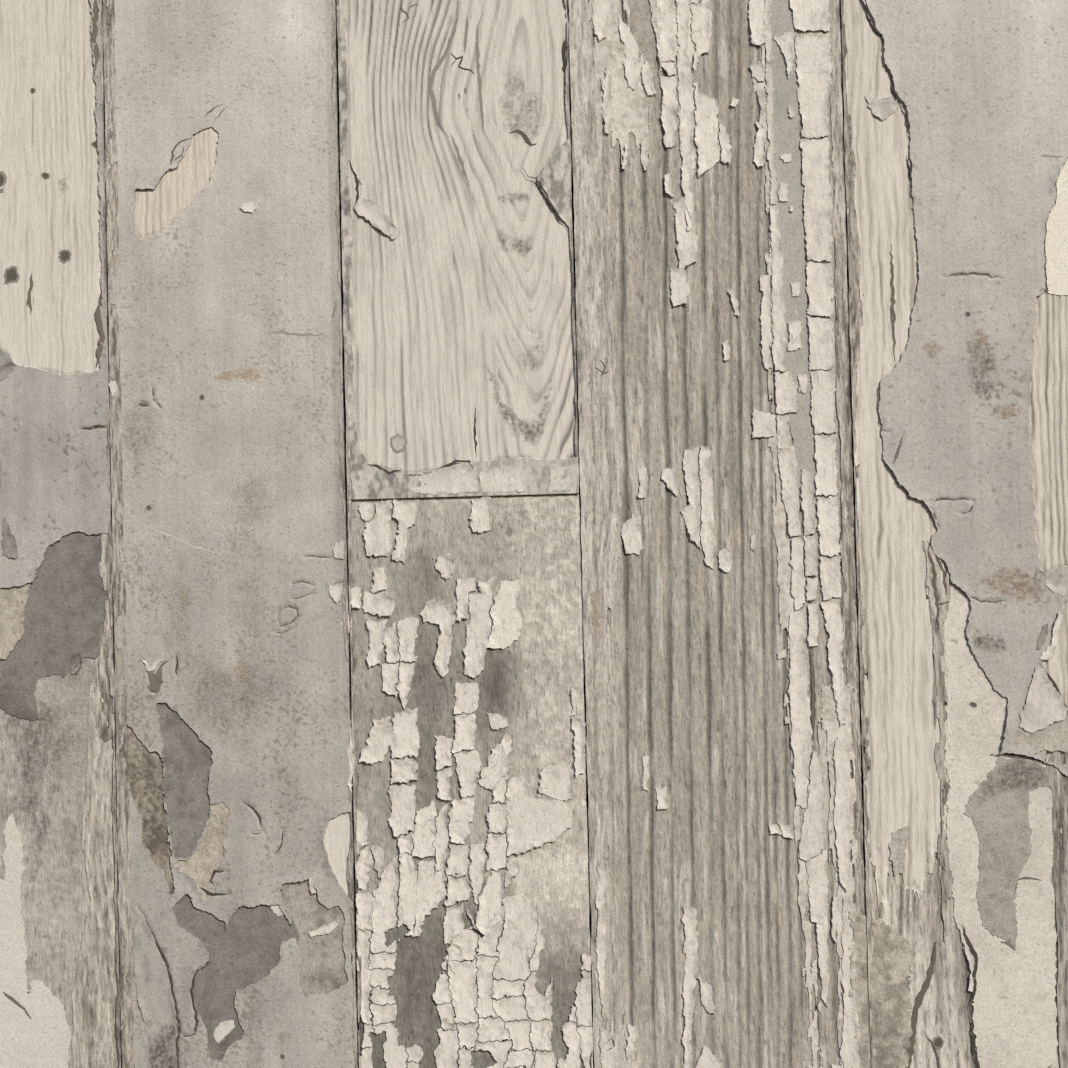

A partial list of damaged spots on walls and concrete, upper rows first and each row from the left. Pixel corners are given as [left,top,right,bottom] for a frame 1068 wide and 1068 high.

peeling [0,0,105,376]
peeling [592,0,739,307]
peeling [728,289,740,316]
peeling [1,516,19,559]
peeling [0,531,107,720]
peeling [127,0,638,1068]
peeling [621,511,643,555]
peeling [661,446,733,572]
peeling [748,0,1068,1068]
peeling [642,755,669,809]
peeling [0,813,72,1068]
peeling [682,905,721,1068]